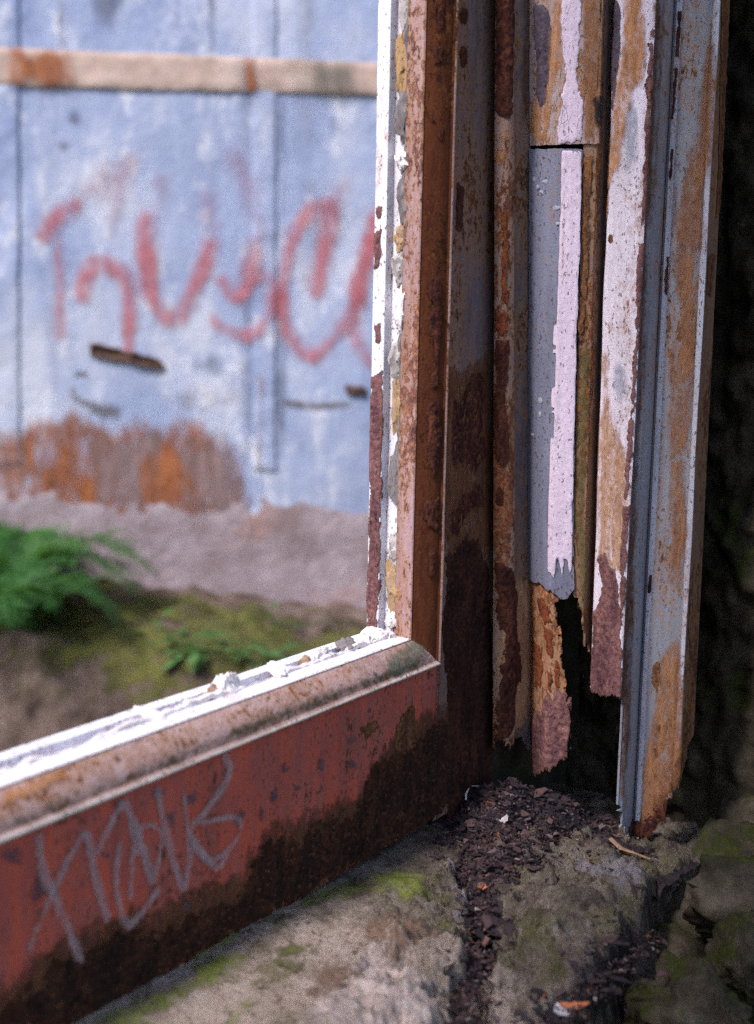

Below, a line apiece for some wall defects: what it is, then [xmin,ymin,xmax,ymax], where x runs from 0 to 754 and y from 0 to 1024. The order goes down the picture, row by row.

corrosion [494,0,561,140]
peeling [610,0,620,109]
corrosion [606,0,682,226]
peeling [533,0,584,577]
corrosion [664,0,730,592]
corrosion [0,206,572,1023]
corrosion [629,643,691,839]
damp [308,964,362,996]
damp [366,912,439,961]